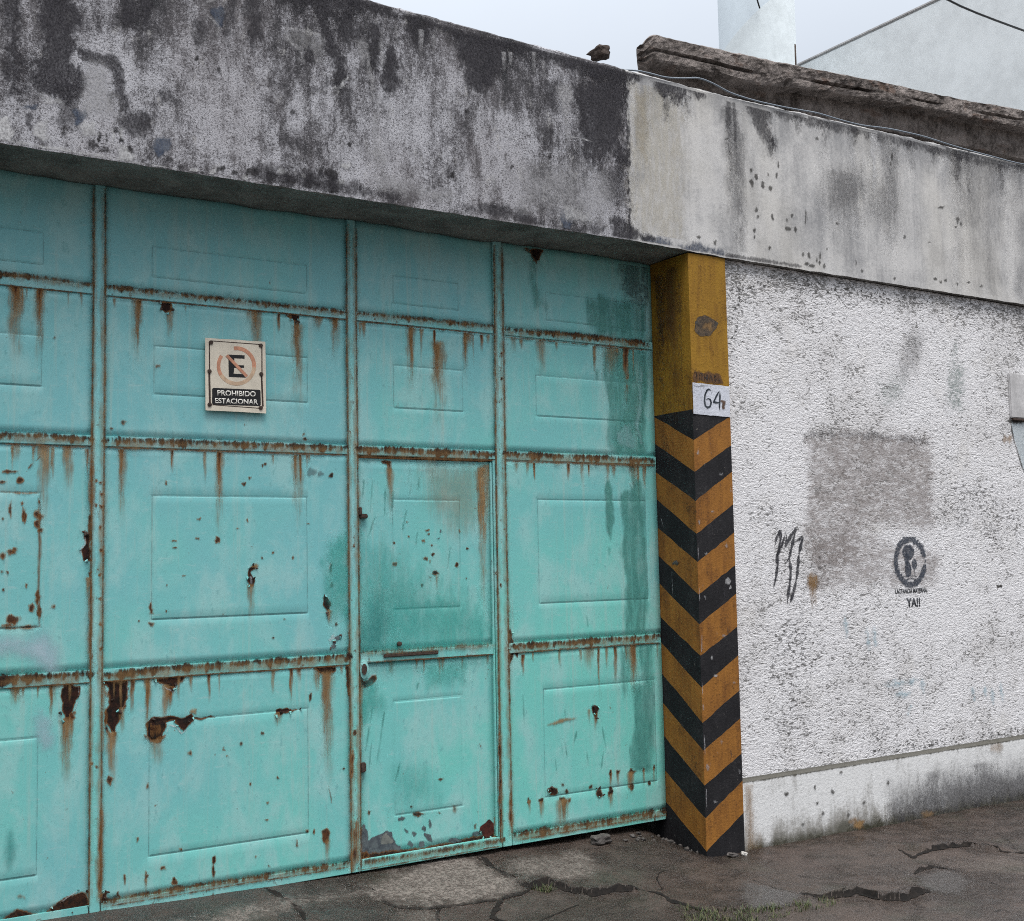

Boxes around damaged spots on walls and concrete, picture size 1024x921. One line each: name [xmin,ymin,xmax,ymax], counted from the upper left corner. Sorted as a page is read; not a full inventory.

leakage [120,0,154,30]
leakage [223,0,262,47]
leakage [0,0,88,104]
leakage [117,111,150,137]
leakage [255,0,1023,359]
corrosion [0,189,666,906]
leakage [894,767,1024,822]
peeling [360,806,495,859]